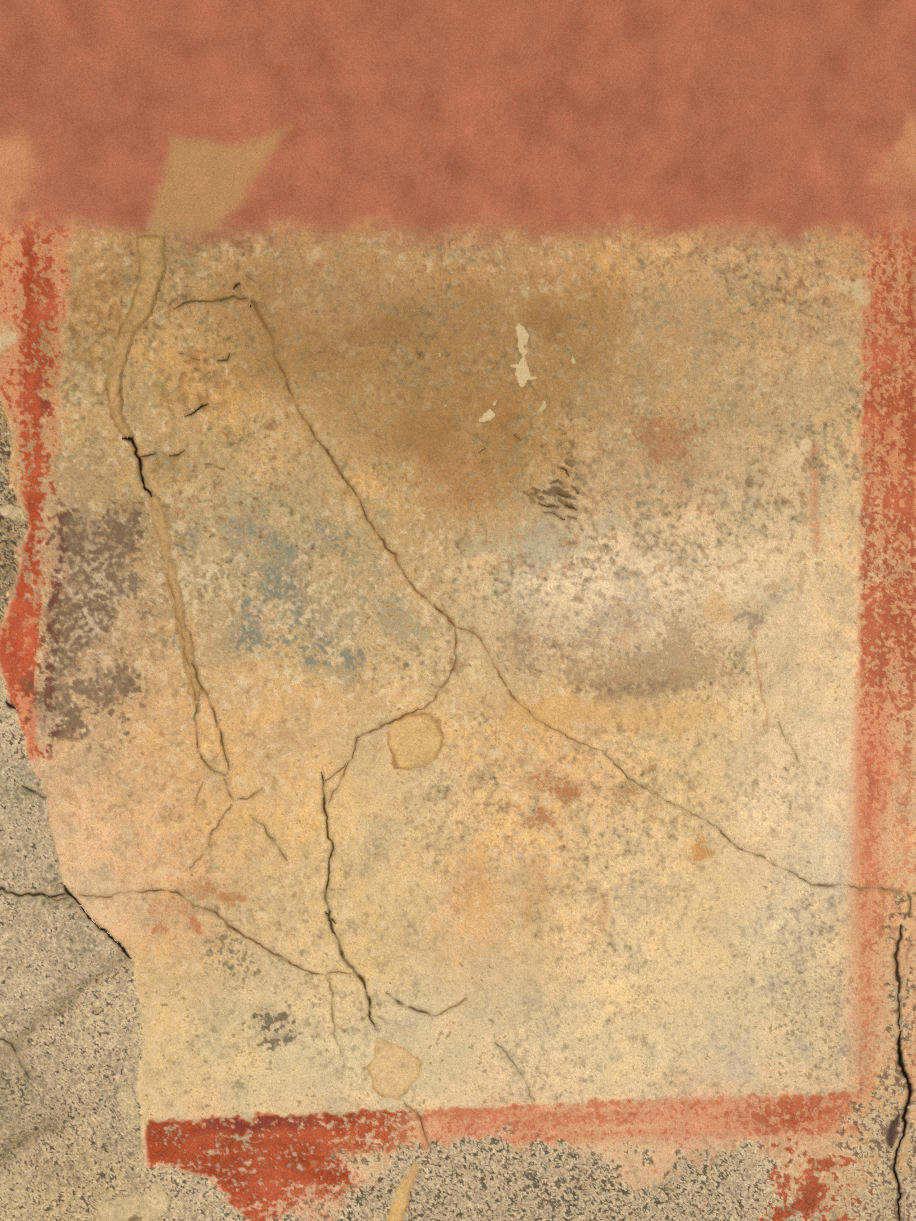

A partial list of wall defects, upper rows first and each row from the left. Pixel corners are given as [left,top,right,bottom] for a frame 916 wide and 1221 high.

spalling [0,400,29,624]
spalling [487,445,606,523]
crack [0,280,916,1221]
spalling [0,676,245,1221]
spalling [188,904,315,1058]
spalling [336,1136,833,1221]